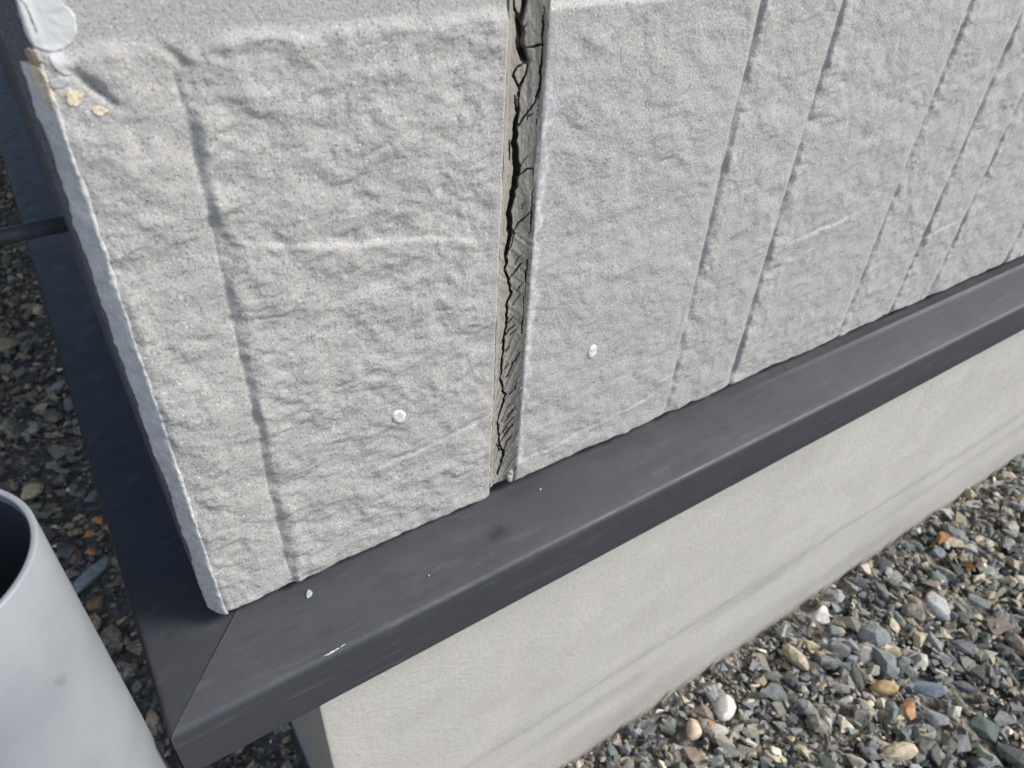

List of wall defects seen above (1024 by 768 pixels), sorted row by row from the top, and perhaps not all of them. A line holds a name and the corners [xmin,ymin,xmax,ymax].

spalling [24,47,122,116]
crack [496,0,545,475]